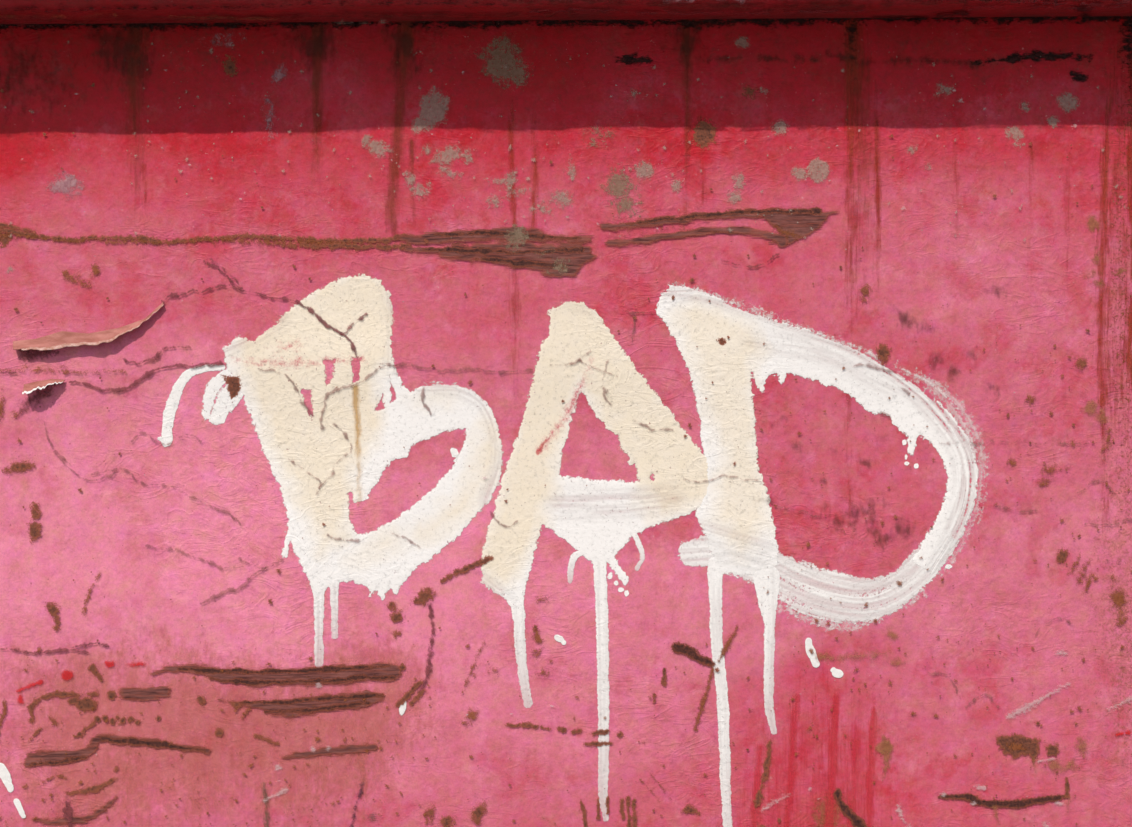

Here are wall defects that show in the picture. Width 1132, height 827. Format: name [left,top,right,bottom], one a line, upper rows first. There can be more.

peeling [475,33,529,88]
peeling [413,89,449,133]
peeling [363,135,389,156]
peeling [423,147,472,176]
peeling [602,161,652,217]
corrosion [1042,86,1132,463]
peeling [13,302,164,361]
peeling [19,379,65,414]